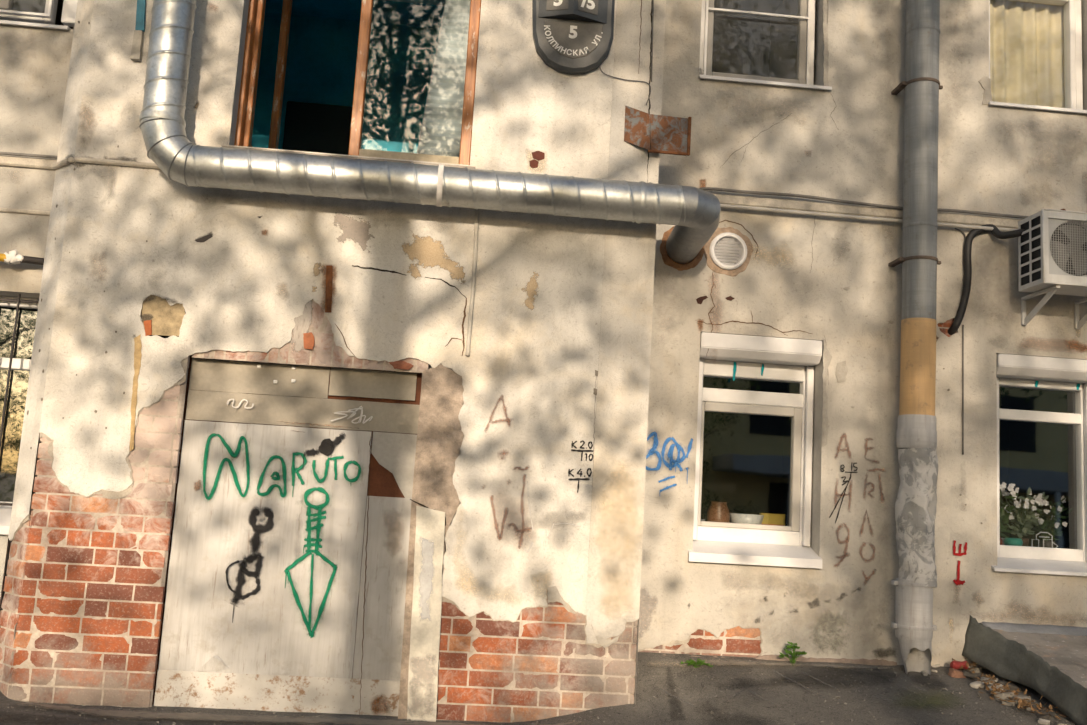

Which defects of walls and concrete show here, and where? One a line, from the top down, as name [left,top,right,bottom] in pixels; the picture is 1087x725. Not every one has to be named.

crack [638,0,653,115]
crack [352,265,467,356]
peeling [402,234,465,283]
peeling [522,272,539,310]
crack [703,272,811,357]
flaking render [0,263,464,719]
flaking render [436,590,763,722]